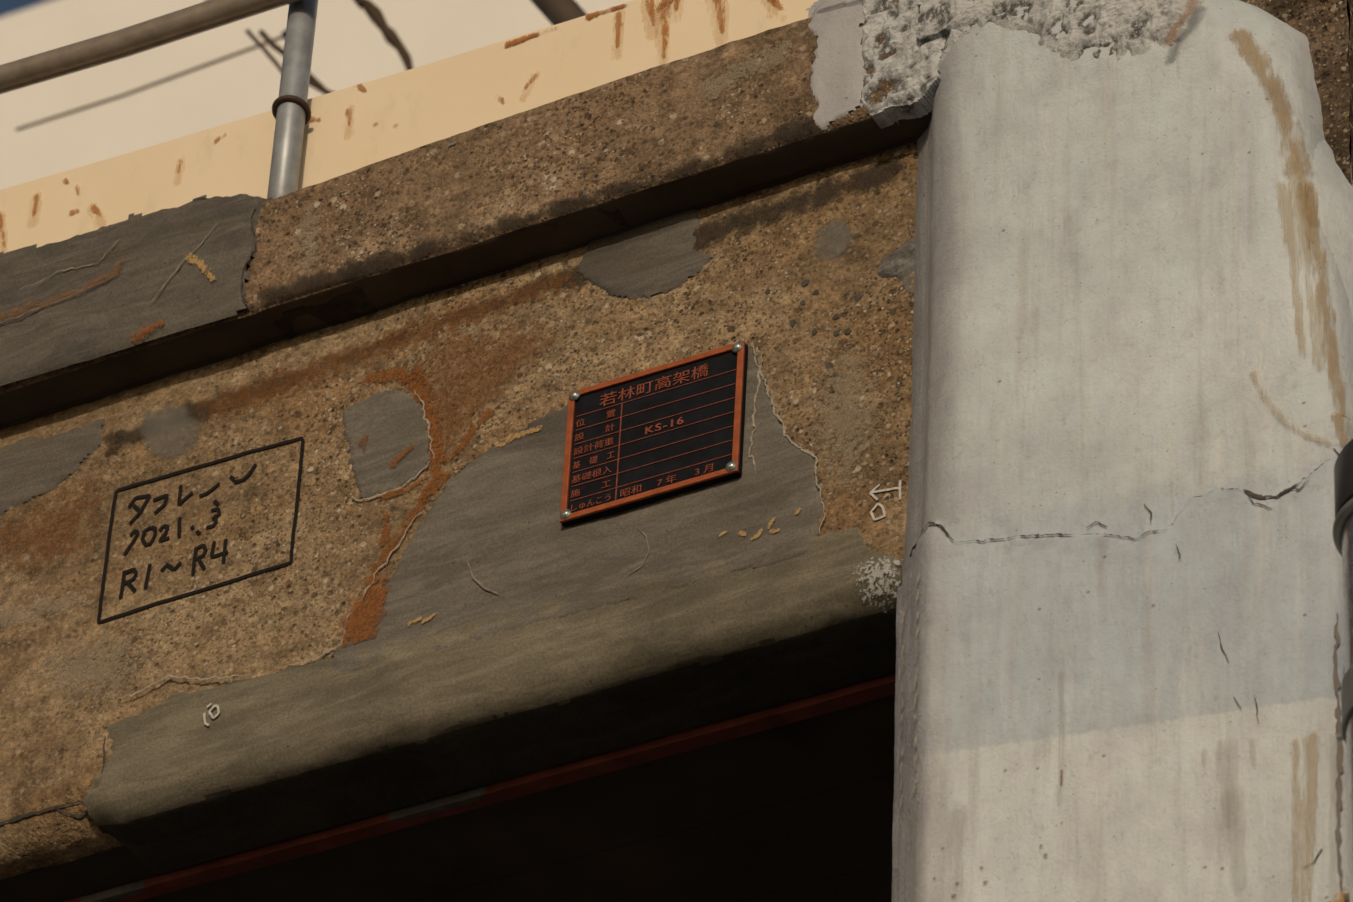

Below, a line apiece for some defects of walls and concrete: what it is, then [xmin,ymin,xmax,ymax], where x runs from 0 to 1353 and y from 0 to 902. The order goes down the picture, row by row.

corrosion [505,27,556,47]
corrosion [585,4,626,47]
corrosion [645,0,679,58]
corrosion [715,0,725,32]
spalling [916,0,1191,64]
corrosion [335,366,494,646]
crack [1190,448,1339,509]
crack [906,504,1181,567]
spalling [1327,887,1350,902]